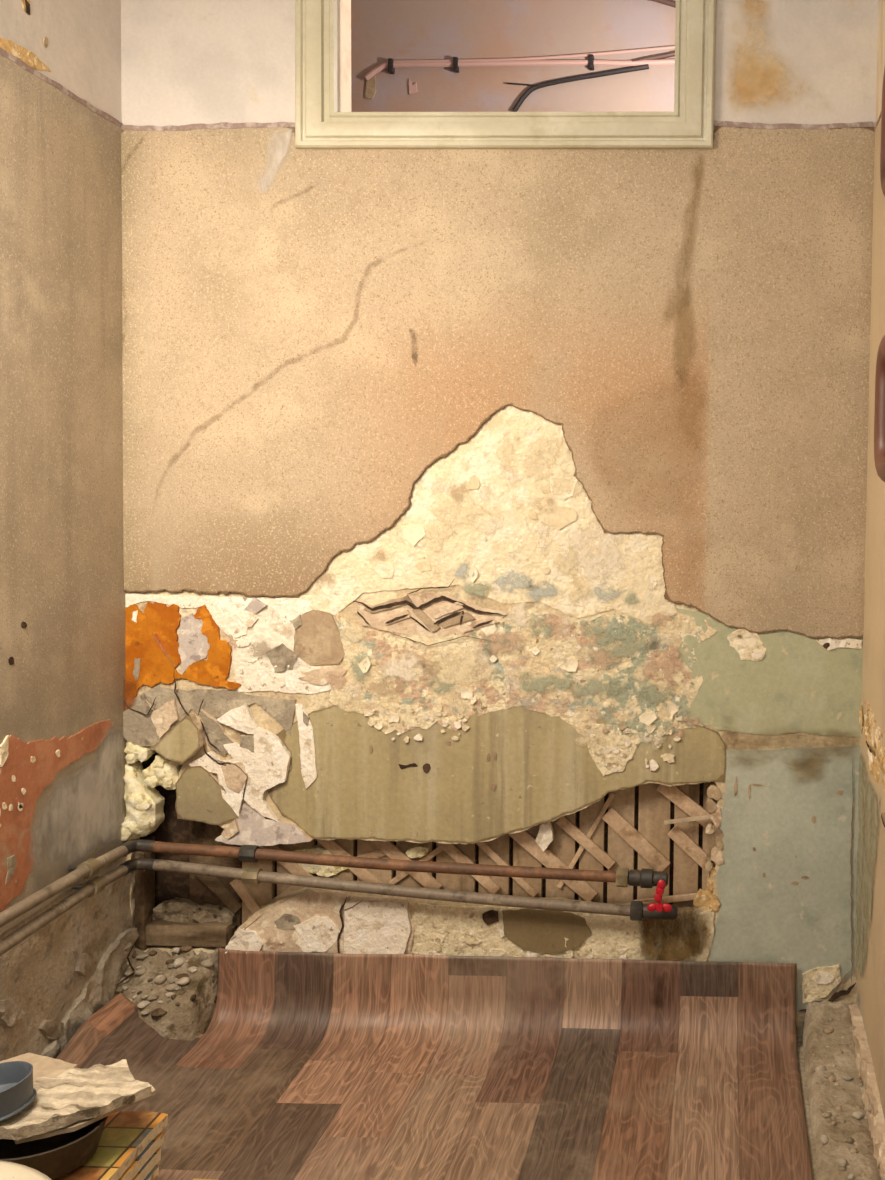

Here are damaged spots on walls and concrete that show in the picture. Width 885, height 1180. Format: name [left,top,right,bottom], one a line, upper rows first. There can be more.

peeling [0,36,51,72]
leakage [738,51,784,102]
flaking render [816,638,862,651]
flaking render [0,405,766,1059]
flaking render [859,700,885,793]